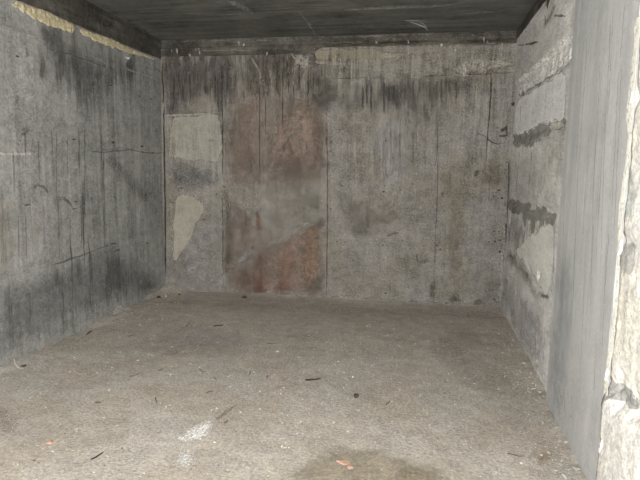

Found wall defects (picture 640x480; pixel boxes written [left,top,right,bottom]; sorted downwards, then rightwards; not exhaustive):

water stain [46,32,134,116]
peeling [168,112,223,162]
water stain [163,20,509,133]
peeling [498,36,573,148]
peeling [169,188,205,261]
peeling [489,189,556,303]
spalling [601,16,640,409]